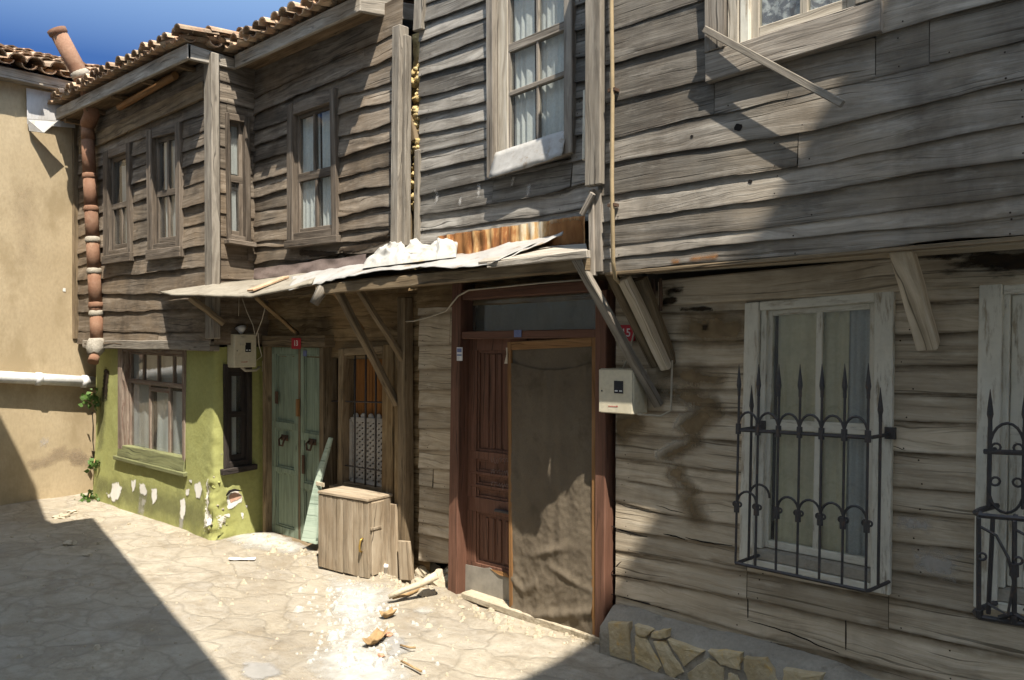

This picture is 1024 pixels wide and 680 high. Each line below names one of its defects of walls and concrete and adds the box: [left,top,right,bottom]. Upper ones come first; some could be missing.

rust [454,231,483,254]
rust [549,218,584,246]
peeling [108,479,157,512]
spalling [179,476,248,530]